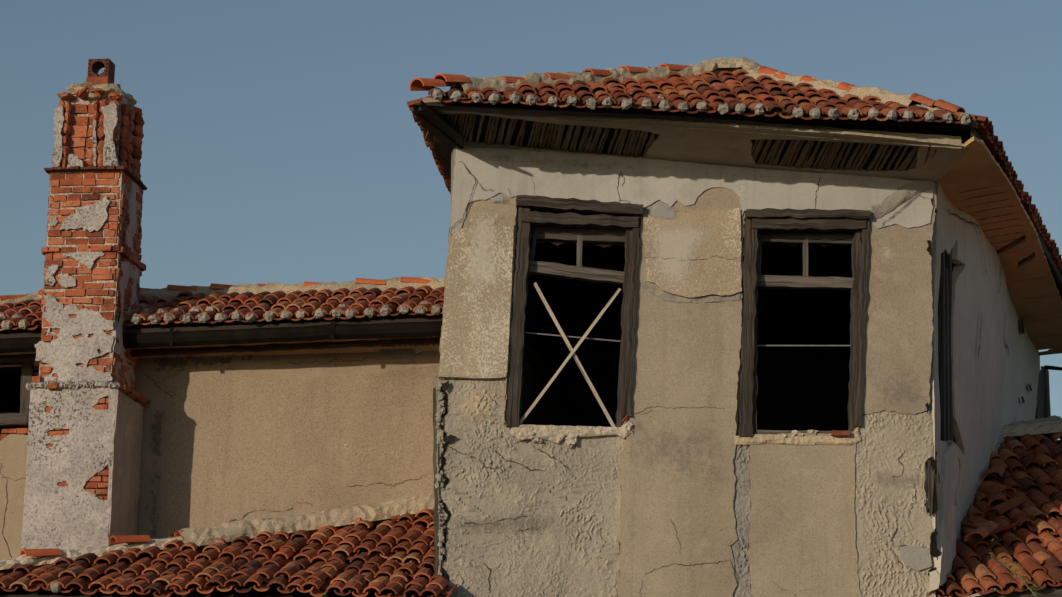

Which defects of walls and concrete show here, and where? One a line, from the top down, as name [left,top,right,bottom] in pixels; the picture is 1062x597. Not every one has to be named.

flaking render [52,103,119,167]
flaking render [34,181,140,388]
flaking render [642,208,742,303]
spalling [0,428,28,441]
spalling [46,429,69,448]
spalling [93,396,109,410]
flaking render [377,224,514,587]
crack [448,445,569,471]
crack [0,464,25,558]
crack [464,514,539,533]
crack [639,521,737,597]